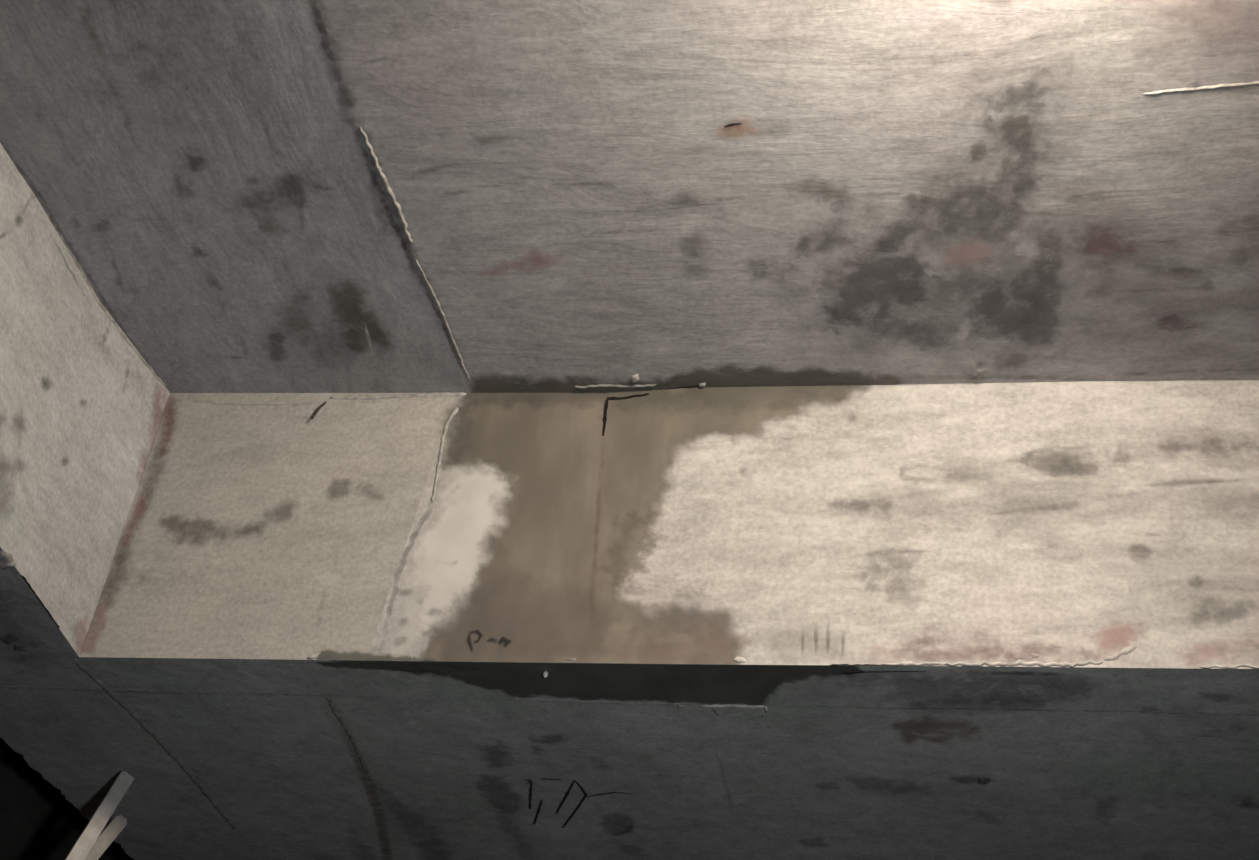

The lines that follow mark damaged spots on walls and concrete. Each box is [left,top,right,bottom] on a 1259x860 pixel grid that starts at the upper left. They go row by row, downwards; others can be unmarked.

water stain [334,287,389,351]
water stain [841,223,924,331]
water stain [340,366,1103,717]